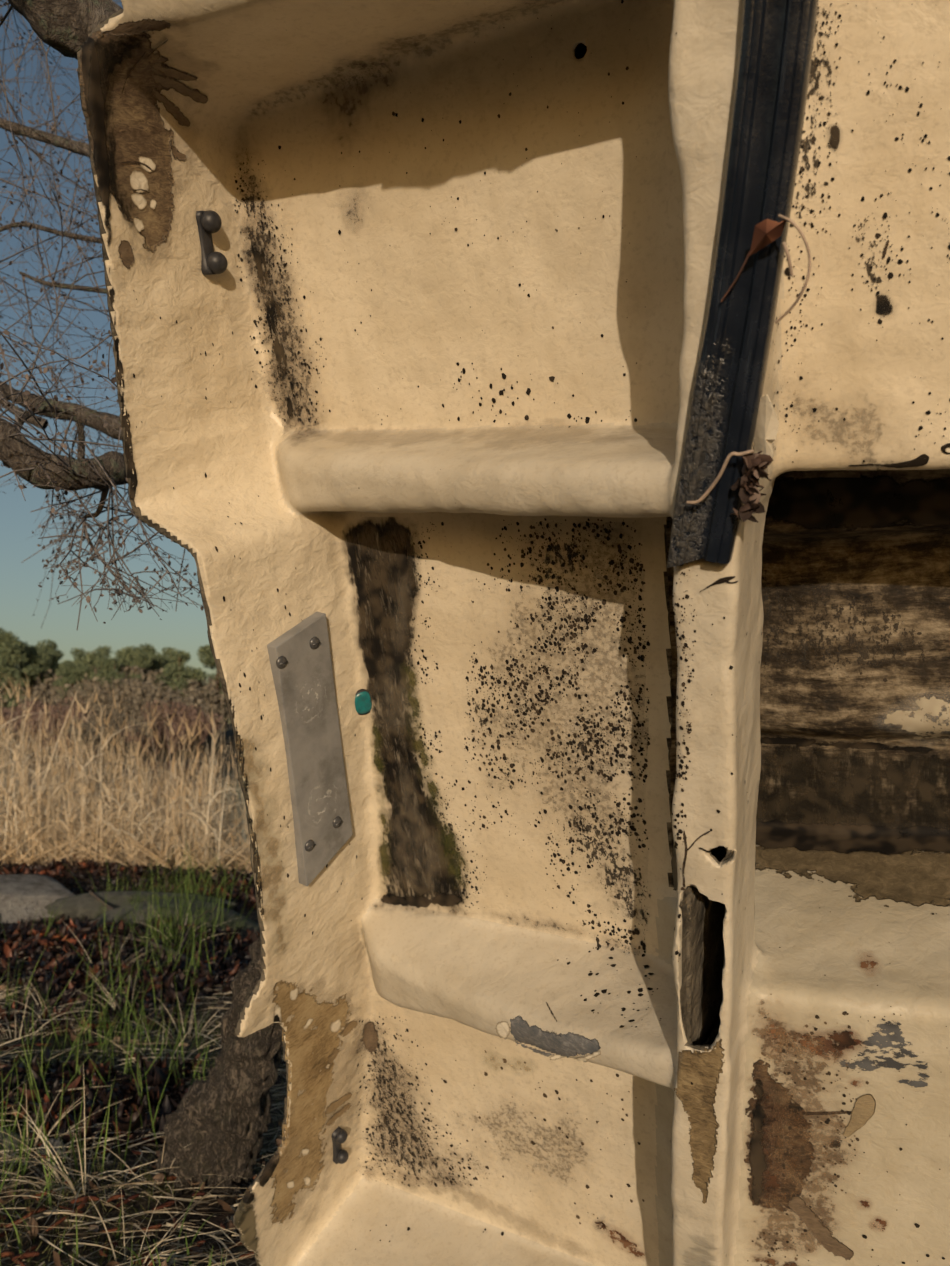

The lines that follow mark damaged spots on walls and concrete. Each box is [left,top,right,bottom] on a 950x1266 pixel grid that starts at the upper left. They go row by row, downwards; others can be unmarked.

peeling [79,18,208,269]
damp [234,148,327,439]
damp [773,3,857,365]
damp [849,192,917,324]
damp [346,518,658,1028]
peeling [884,696,950,741]
peeling [270,980,357,1224]
damp [356,1016,487,1187]
peeling [496,1002,601,1062]
spalling [674,1039,725,1204]
corrosion [747,1001,862,1266]
corrosion [860,1200,887,1231]